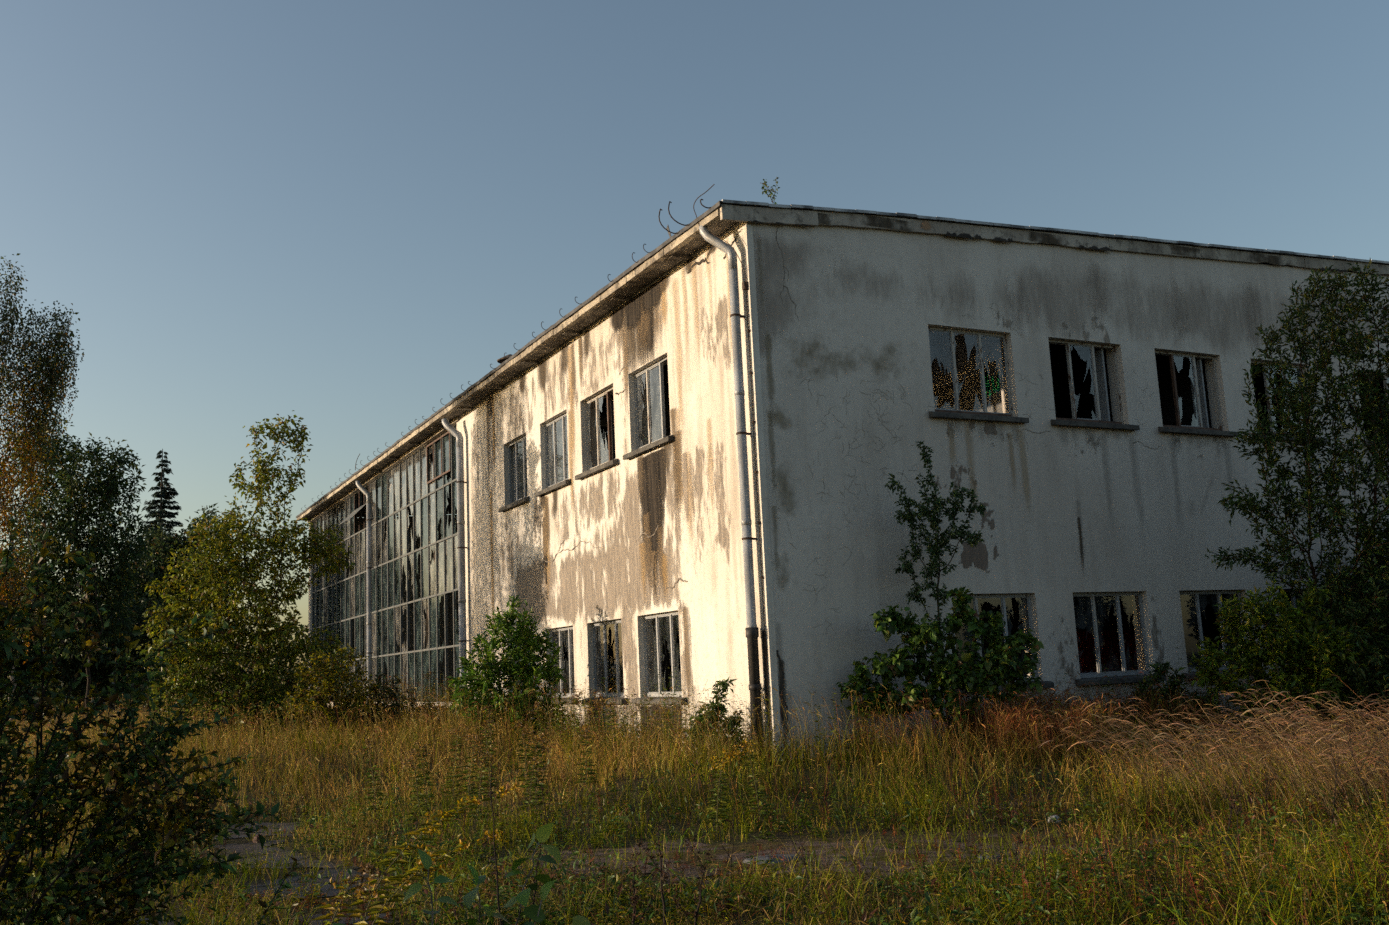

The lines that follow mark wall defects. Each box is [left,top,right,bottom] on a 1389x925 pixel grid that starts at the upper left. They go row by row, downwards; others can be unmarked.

water stain [685,244,716,271]
water stain [519,344,568,392]
water stain [610,274,669,394]
water stain [637,409,688,592]
crack [785,375,930,633]
peeling [934,466,999,572]
water stain [683,607,691,688]